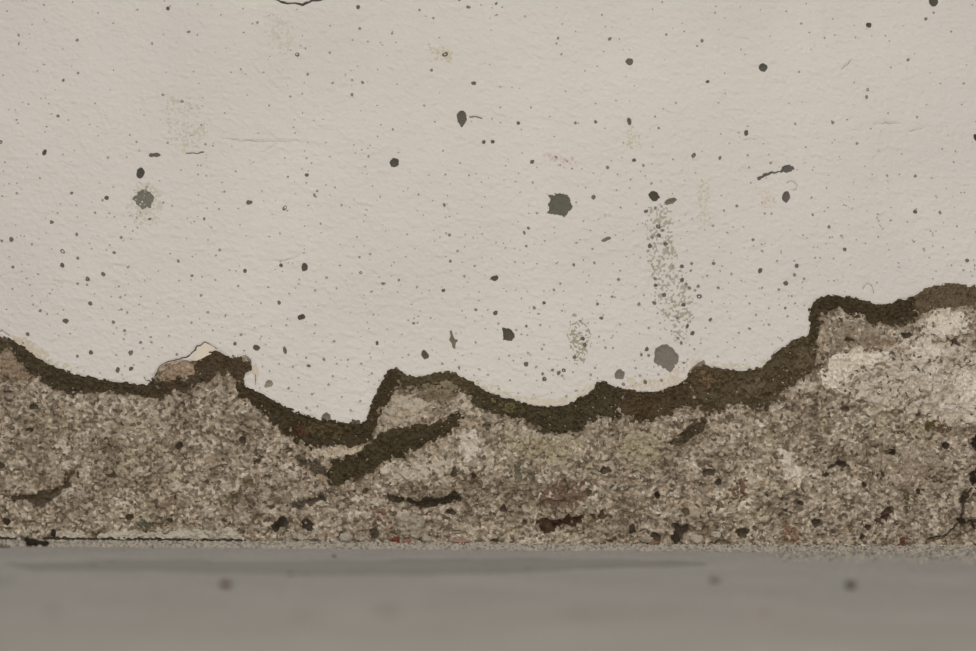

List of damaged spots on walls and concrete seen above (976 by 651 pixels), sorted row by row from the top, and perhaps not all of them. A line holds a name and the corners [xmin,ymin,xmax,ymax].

crack [277,0,322,8]
peeling [502,327,515,341]
peeling [192,344,214,361]
peeling [654,344,679,373]
peeling [252,364,273,388]
spalling [702,469,722,485]
spalling [735,528,750,538]